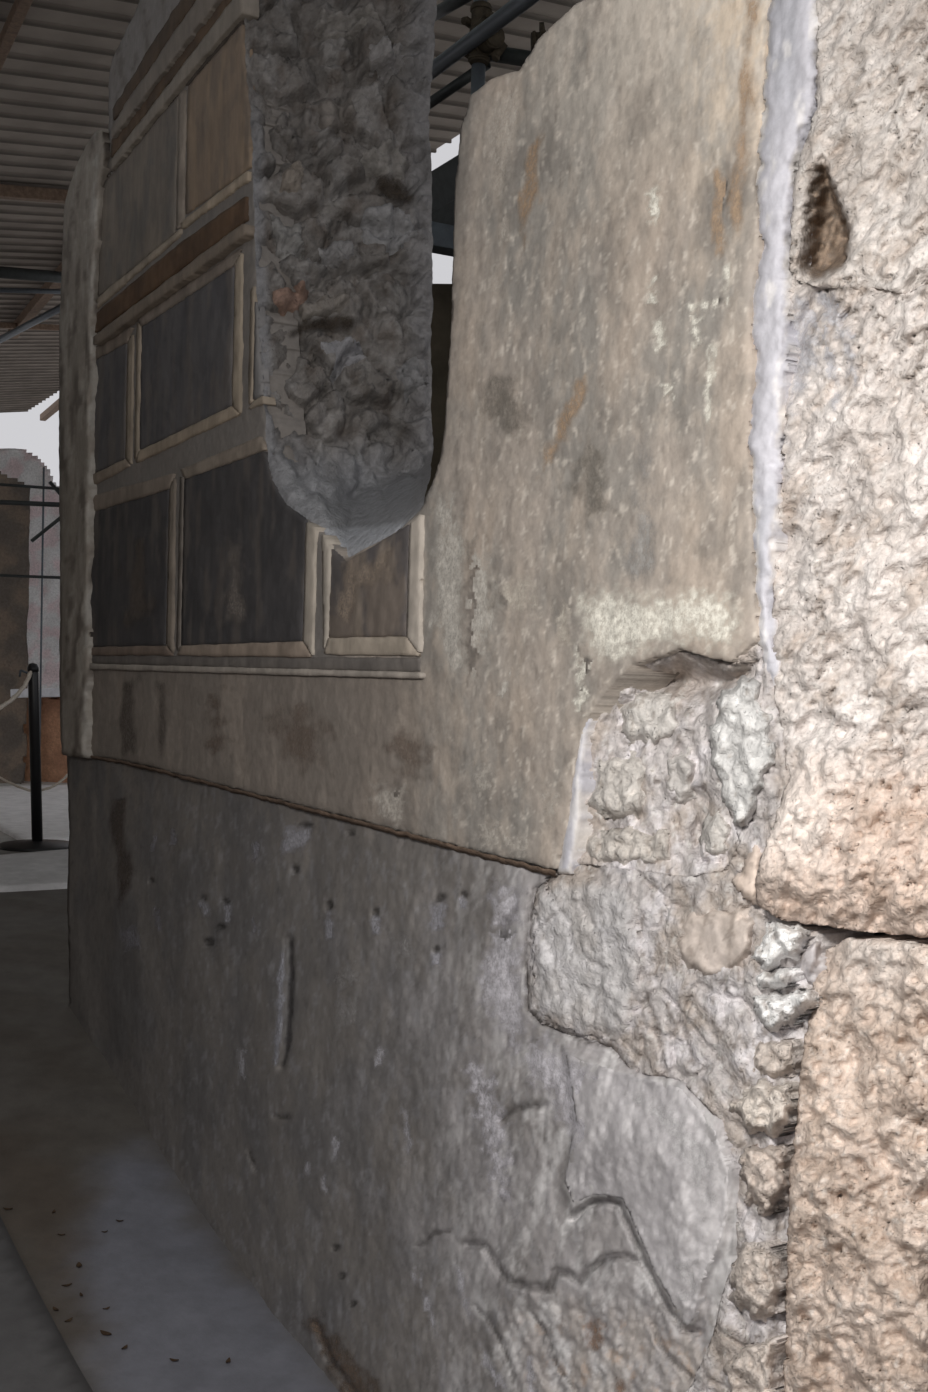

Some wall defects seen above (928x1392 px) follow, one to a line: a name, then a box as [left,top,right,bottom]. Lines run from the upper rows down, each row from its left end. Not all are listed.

spalling [376,176,413,202]
spalling [291,315,353,335]
damp [557,591,736,711]
spalling [86,651,777,1042]